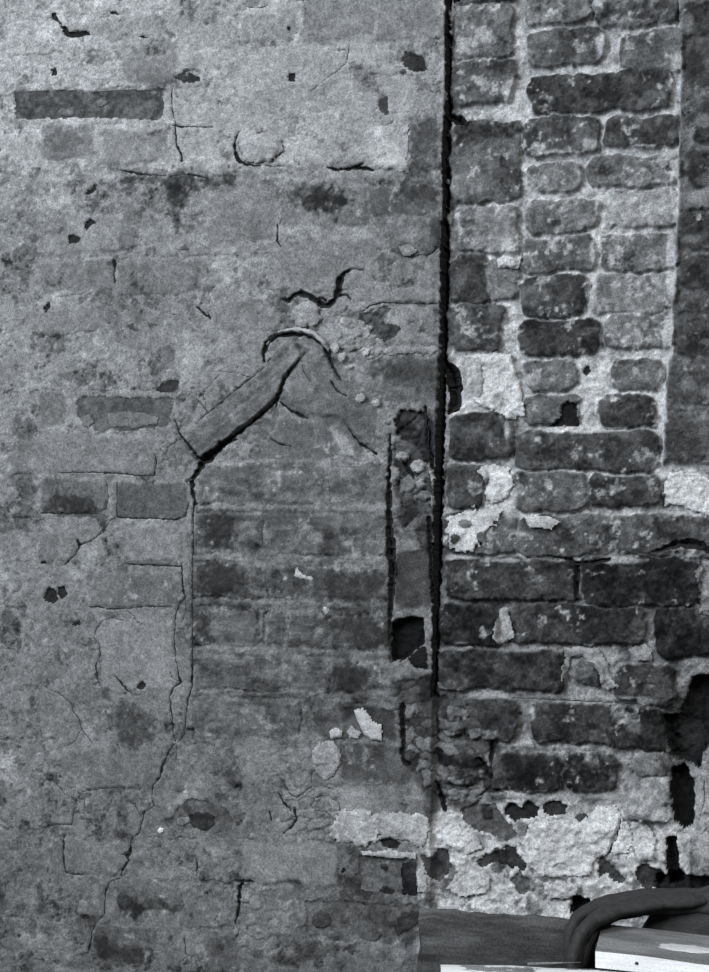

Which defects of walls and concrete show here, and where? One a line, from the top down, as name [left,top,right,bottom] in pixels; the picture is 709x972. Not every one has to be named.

spalling [399,51,428,74]
crack [279,0,468,697]
spalling [385,410,446,508]
peeling [524,516,561,530]
crack [652,538,709,553]
crack [548,555,611,600]
crack [41,332,347,957]
peeling [493,607,515,645]
peeling [561,645,619,691]
crack [399,705,409,766]
crack [476,740,495,798]
peeling [305,800,665,946]